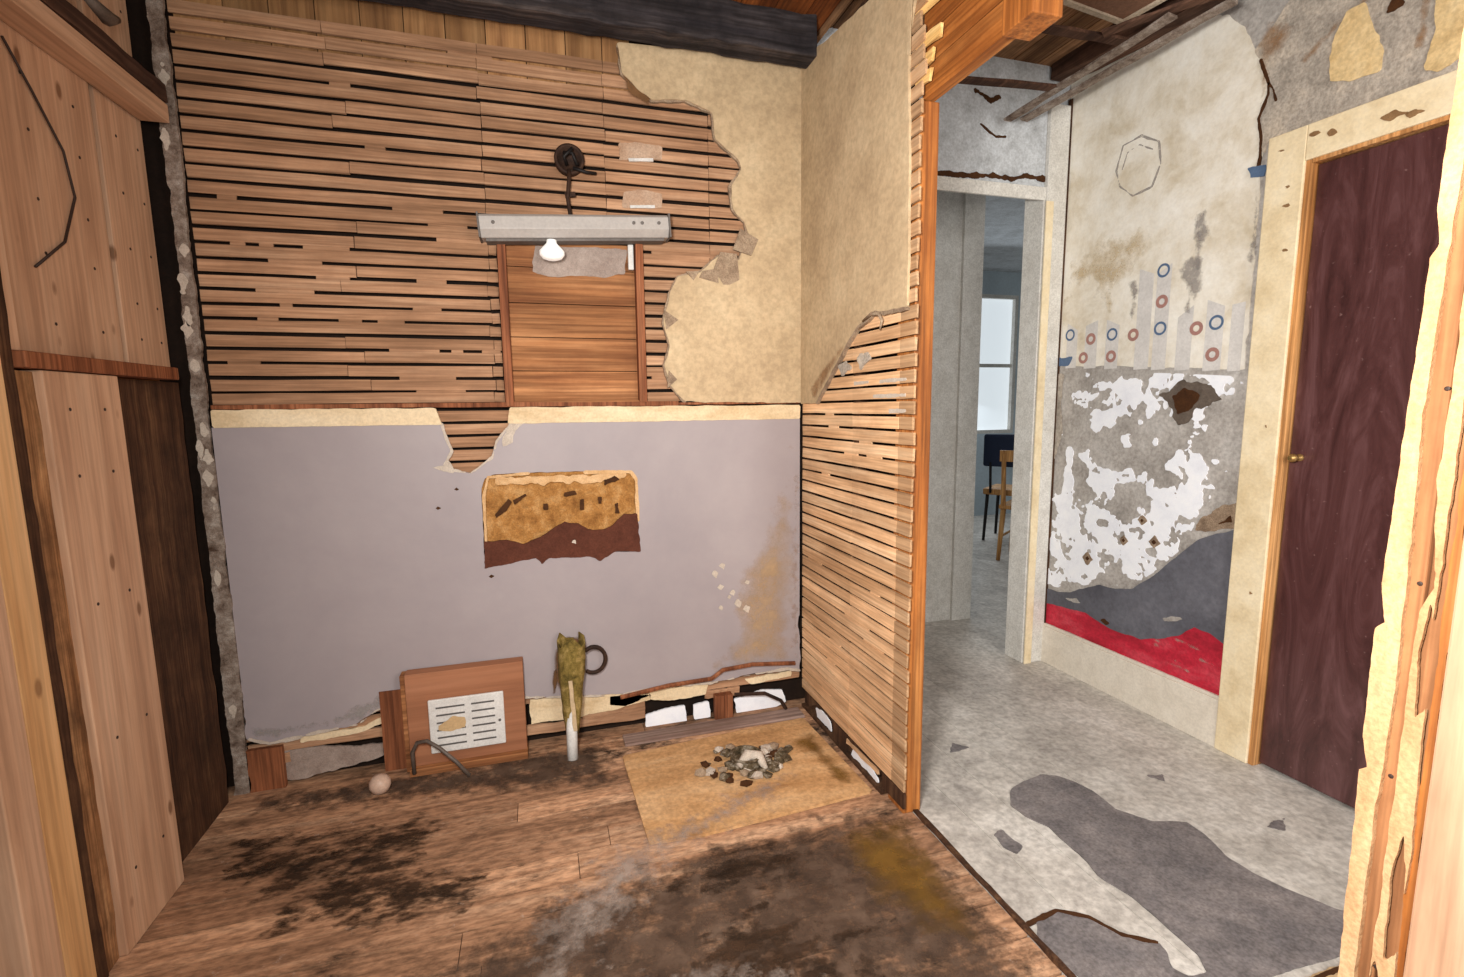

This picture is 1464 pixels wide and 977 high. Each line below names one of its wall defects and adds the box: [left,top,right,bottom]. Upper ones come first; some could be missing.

spalling [1255,0,1464,153]
spalling [616,45,759,402]
spalling [433,423,524,474]
spalling [495,494,527,518]
spalling [564,476,620,513]
peeling [1046,356,1243,695]
peeling [529,683,710,727]
peeling [734,670,792,713]